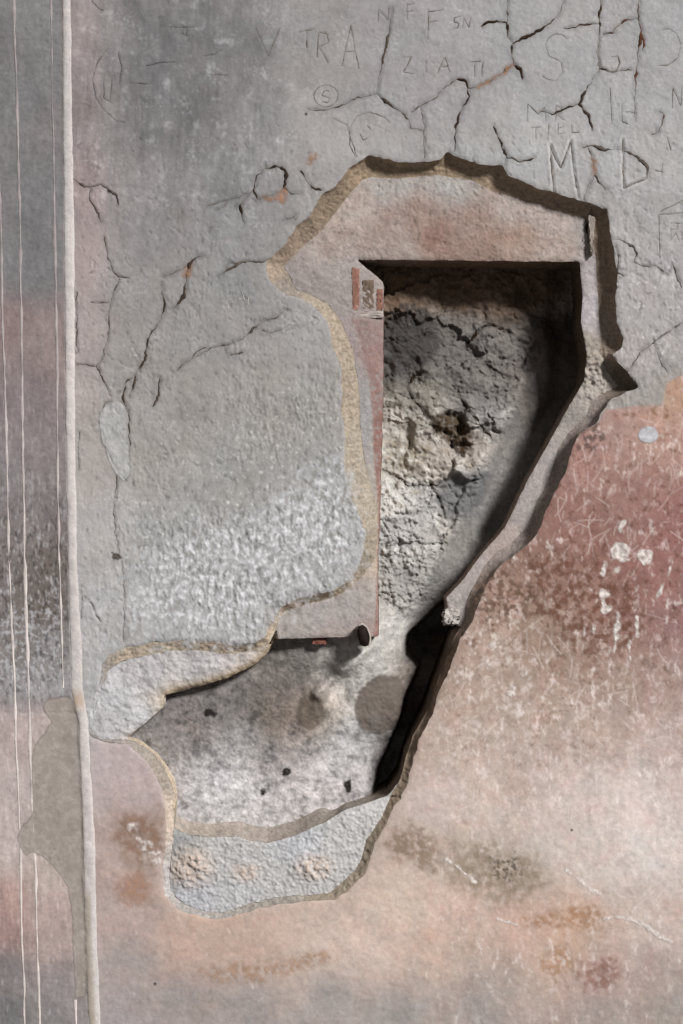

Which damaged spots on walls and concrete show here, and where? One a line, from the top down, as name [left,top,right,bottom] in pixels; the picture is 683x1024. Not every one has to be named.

crack [308,0,683,288]
crack [208,165,322,220]
crack [463,324,537,379]
crack [631,322,683,371]
crack [73,178,287,640]
crack [407,372,434,421]
crack [458,393,493,441]
flaking render [99,152,639,920]
leakage [395,832,434,865]